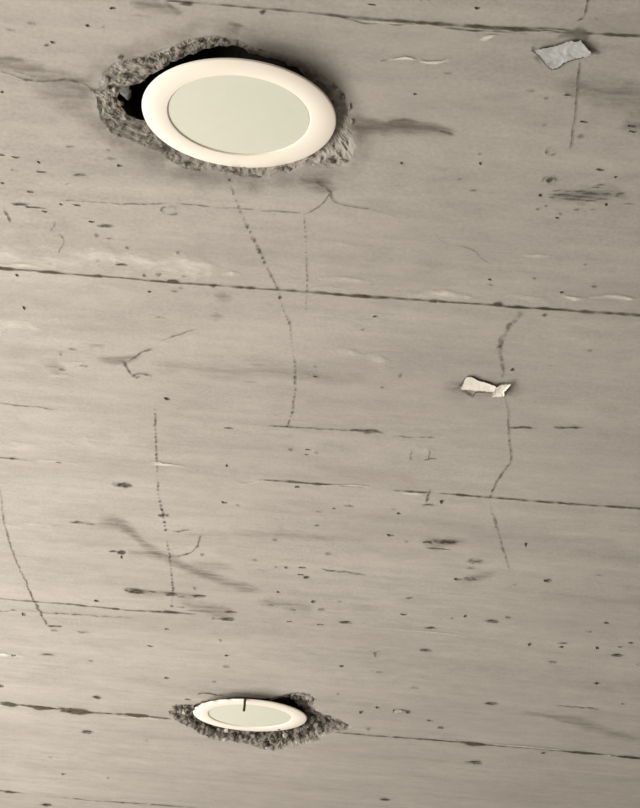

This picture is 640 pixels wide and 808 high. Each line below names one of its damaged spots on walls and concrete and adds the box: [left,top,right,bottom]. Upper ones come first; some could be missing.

peeling [531,29,598,70]
spalling [91,35,357,180]
peeling [460,376,511,397]
crack [490,415,531,497]
spalling [168,692,352,751]